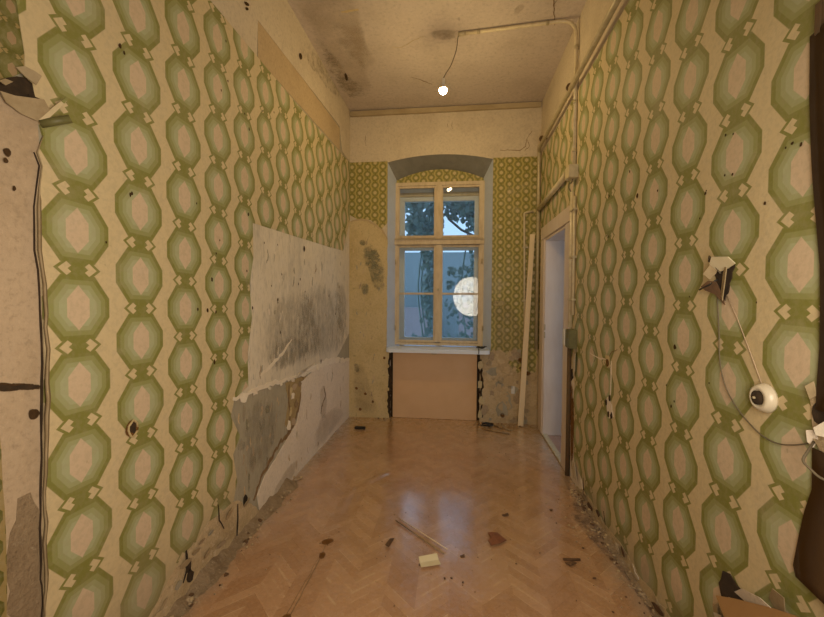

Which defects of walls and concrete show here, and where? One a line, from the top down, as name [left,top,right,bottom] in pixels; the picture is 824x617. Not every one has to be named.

peeling [149,218,393,617]
spalling [478,348,538,425]